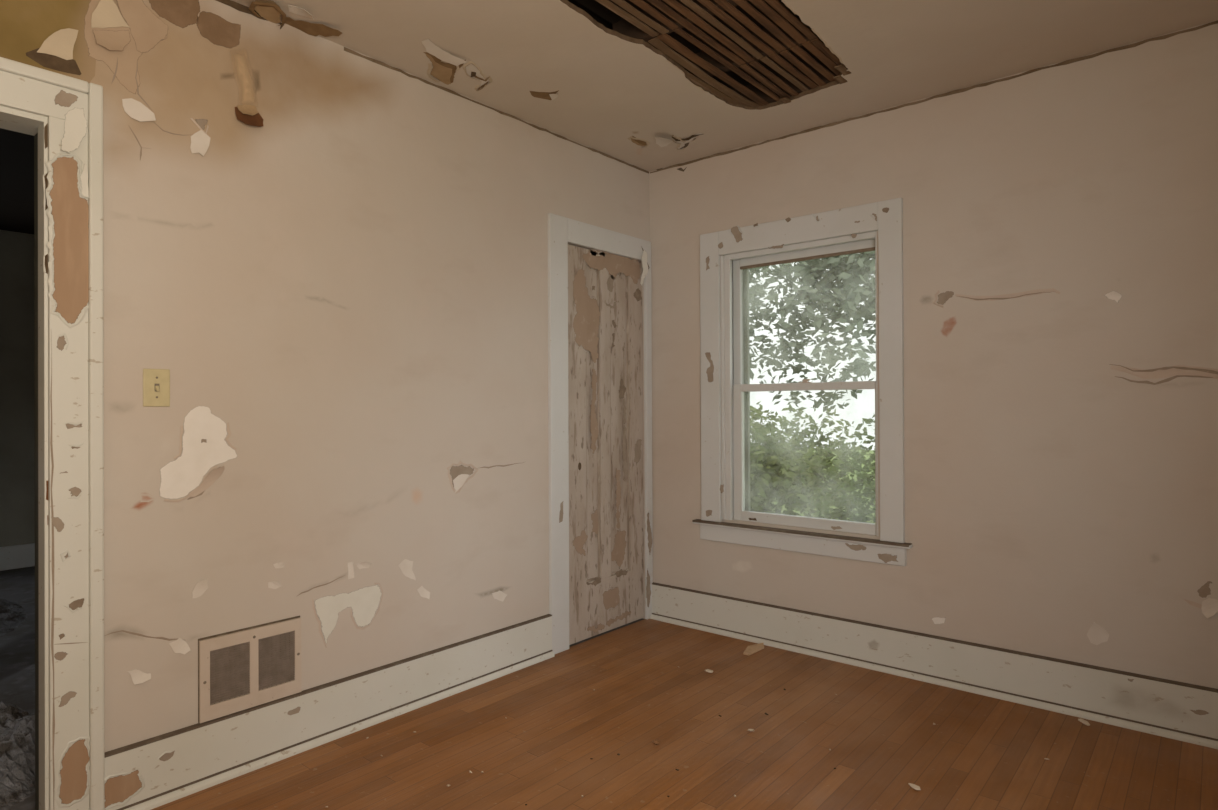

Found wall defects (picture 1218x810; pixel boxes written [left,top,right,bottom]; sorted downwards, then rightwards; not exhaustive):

flaking render [249,0,342,37]
peeling [37,0,241,122]
peeling [422,39,493,91]
flaking render [575,0,851,110]
peeling [190,118,210,156]
peeling [43,90,90,351]
crack [955,288,1061,301]
peeling [159,406,237,502]
peeling [447,461,478,494]
peeling [312,562,383,648]
peeling [54,736,90,808]
peeling [105,770,145,810]